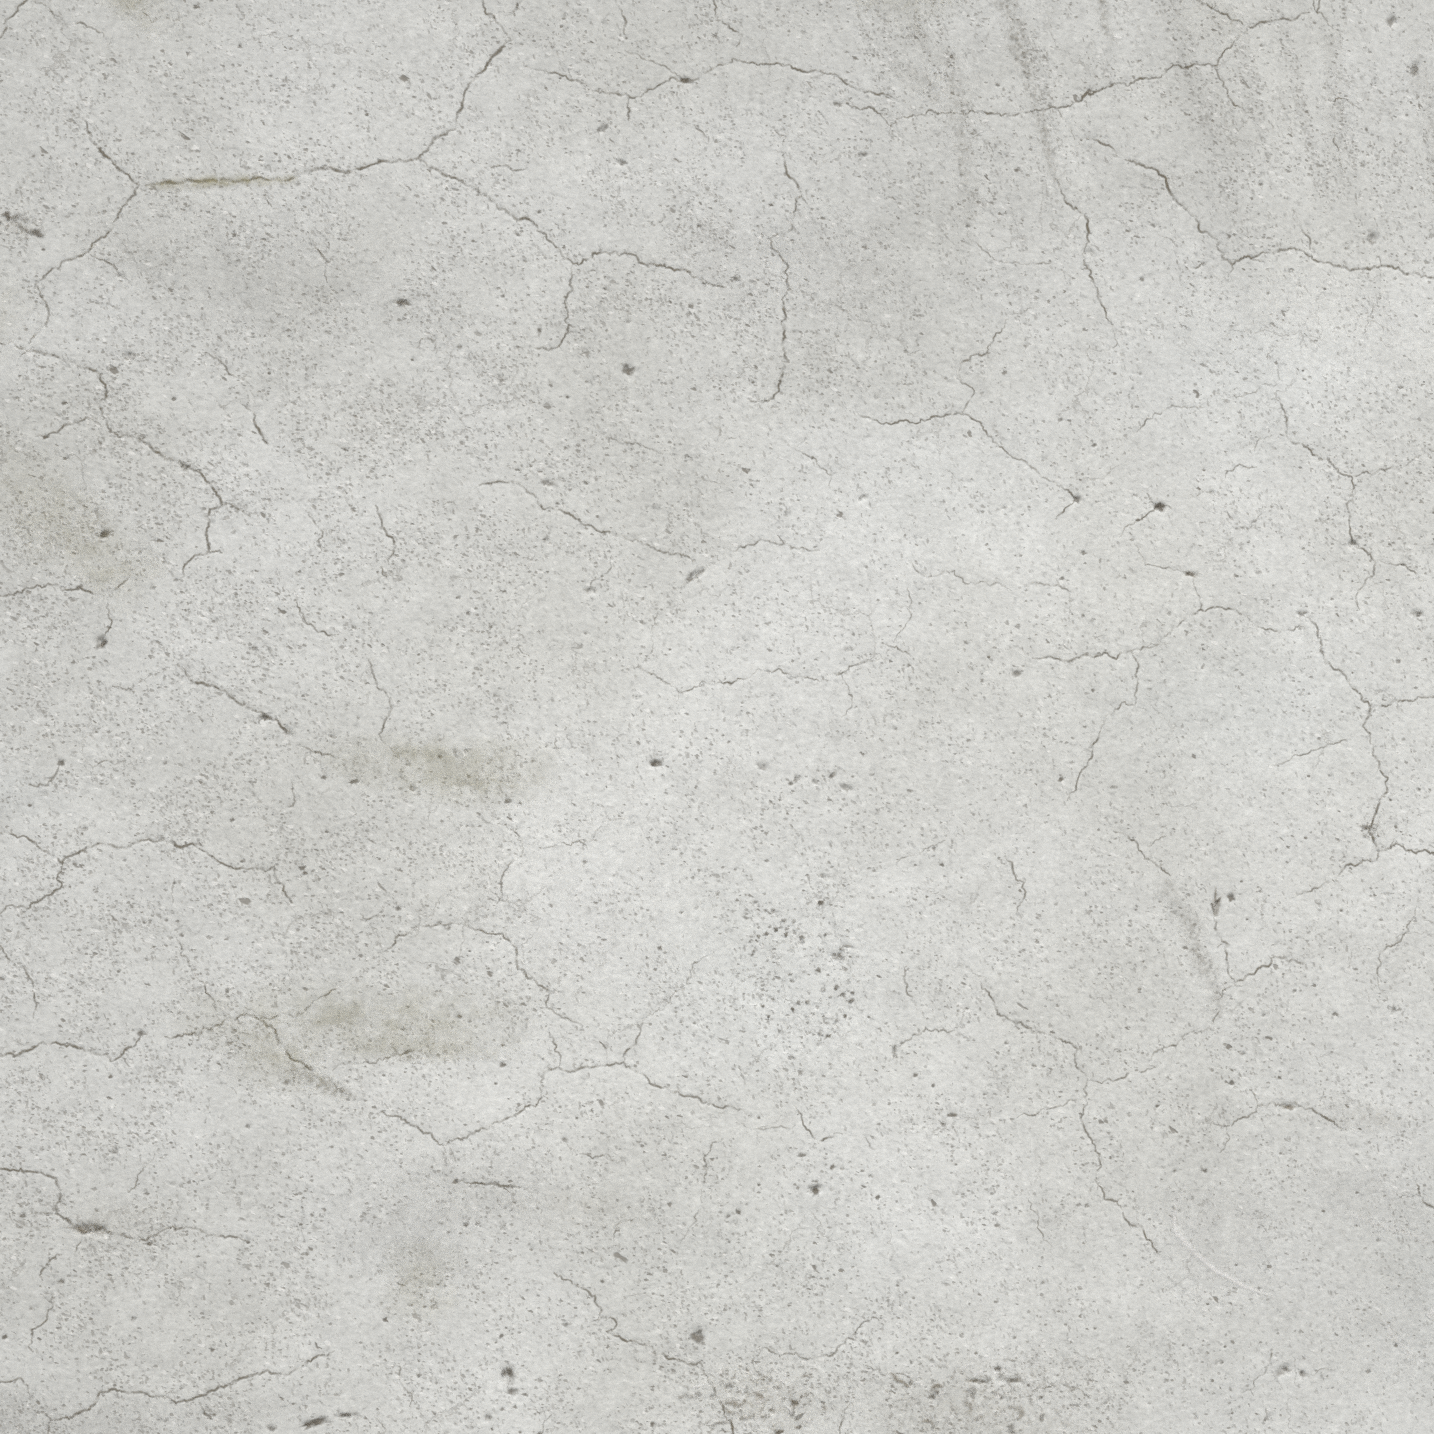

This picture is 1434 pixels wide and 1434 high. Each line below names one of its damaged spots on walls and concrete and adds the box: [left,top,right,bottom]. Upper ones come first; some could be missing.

crack [331,7,503,181]
crack [969,2,1320,116]
crack [38,127,293,307]
crack [1097,140,1172,195]
crack [519,217,689,349]
crack [879,332,1008,453]
crack [183,472,238,569]
crack [1300,666,1434,866]
crack [5,834,99,909]
crack [140,839,288,897]
crack [7,1042,81,1057]
crack [61,1356,317,1419]